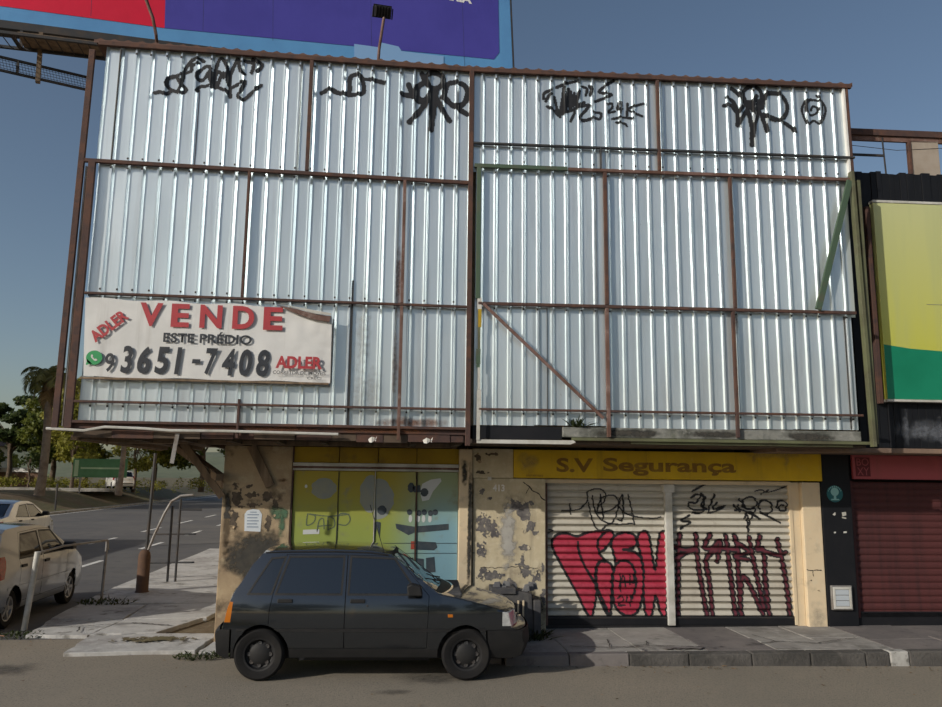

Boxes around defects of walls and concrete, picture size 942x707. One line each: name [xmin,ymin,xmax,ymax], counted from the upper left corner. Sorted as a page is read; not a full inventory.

peeling [229,482,279,531]
peeling [472,498,546,613]